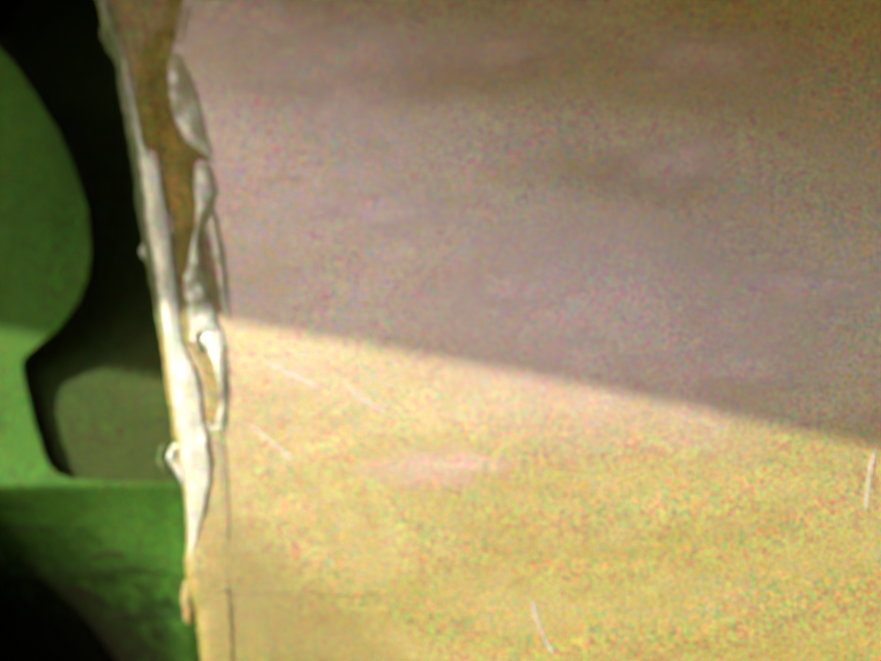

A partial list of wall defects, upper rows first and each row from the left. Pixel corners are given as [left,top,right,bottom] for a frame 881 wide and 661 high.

peeling [100,0,230,561]
spalling [181,579,195,625]
crack [226,588,234,661]